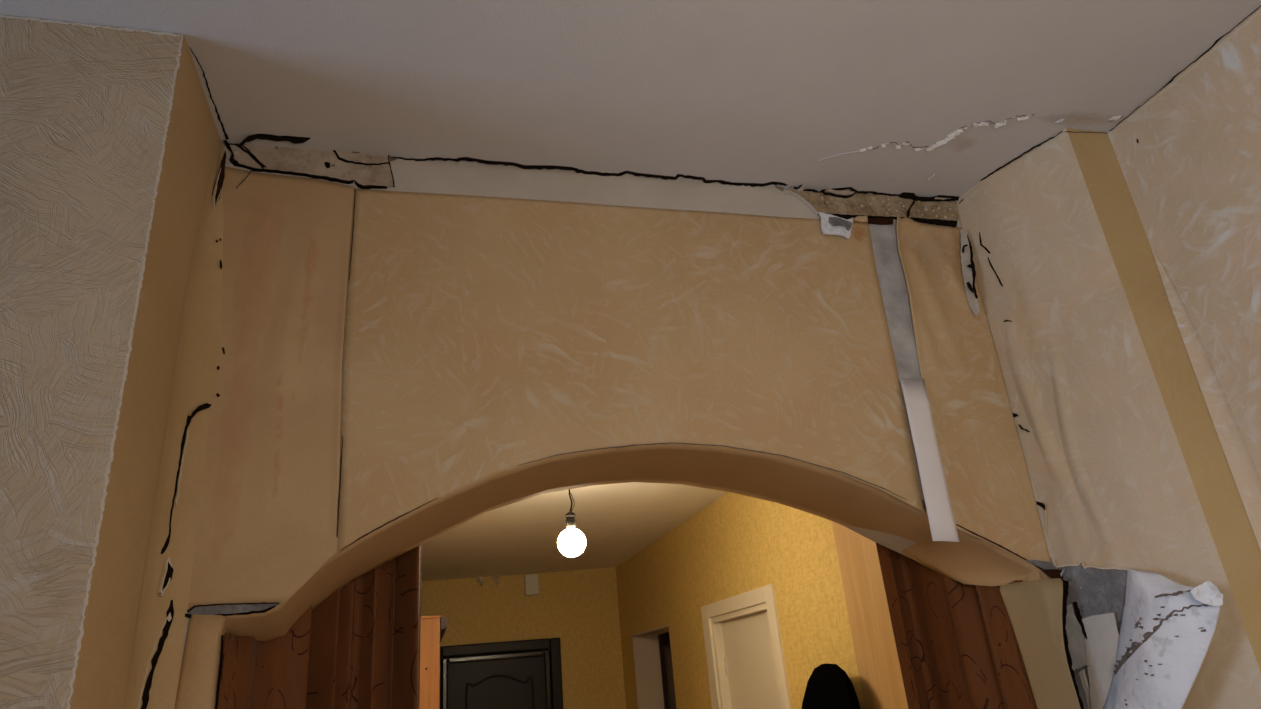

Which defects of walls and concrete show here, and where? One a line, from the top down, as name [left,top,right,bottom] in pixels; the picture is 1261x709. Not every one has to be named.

crack [393,6,1261,203]
peeling [818,114,1034,161]
flaking render [775,186,959,385]
crack [161,393,220,554]
crack [137,600,278,709]
flaking render [1026,559,1127,709]